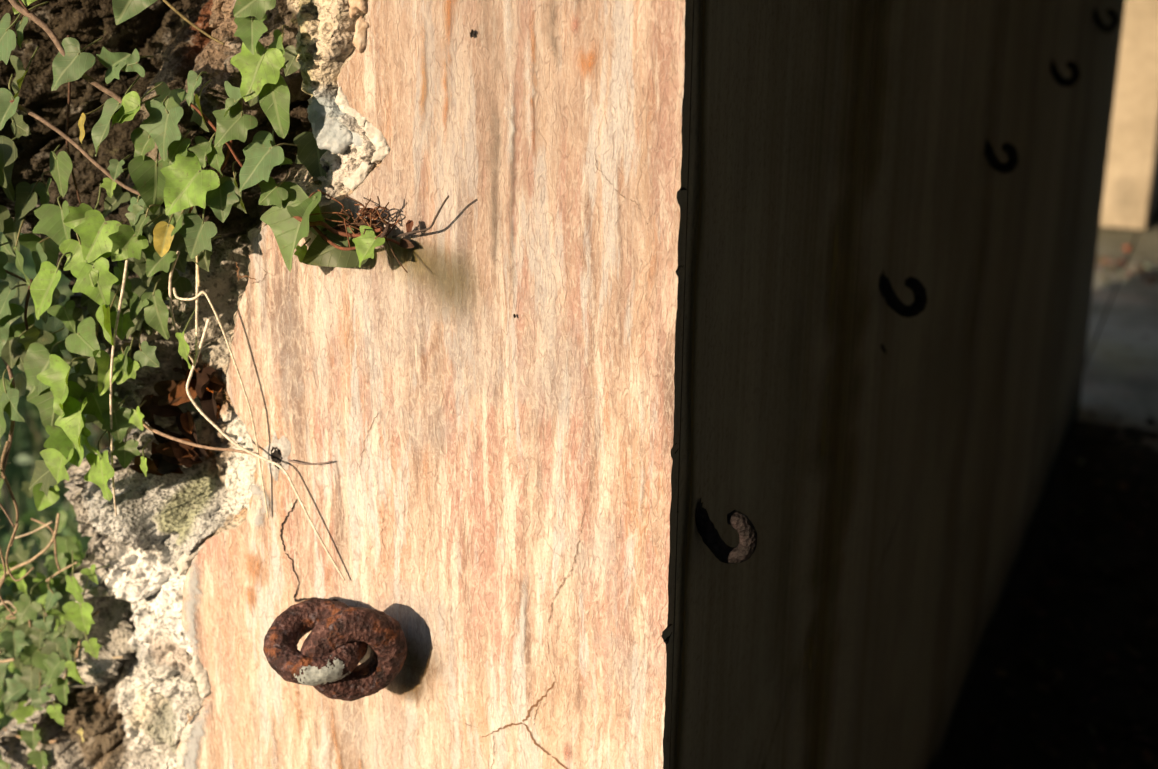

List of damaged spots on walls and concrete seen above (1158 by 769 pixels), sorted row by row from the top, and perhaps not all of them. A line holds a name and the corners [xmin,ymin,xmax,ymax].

flaking render [348,0,369,53]
flaking render [307,86,391,191]
spalling [263,431,291,482]
flaking render [176,543,204,576]
crack [280,499,337,602]
crack [467,500,586,769]
flaking render [189,655,211,698]
flaking render [176,722,195,769]